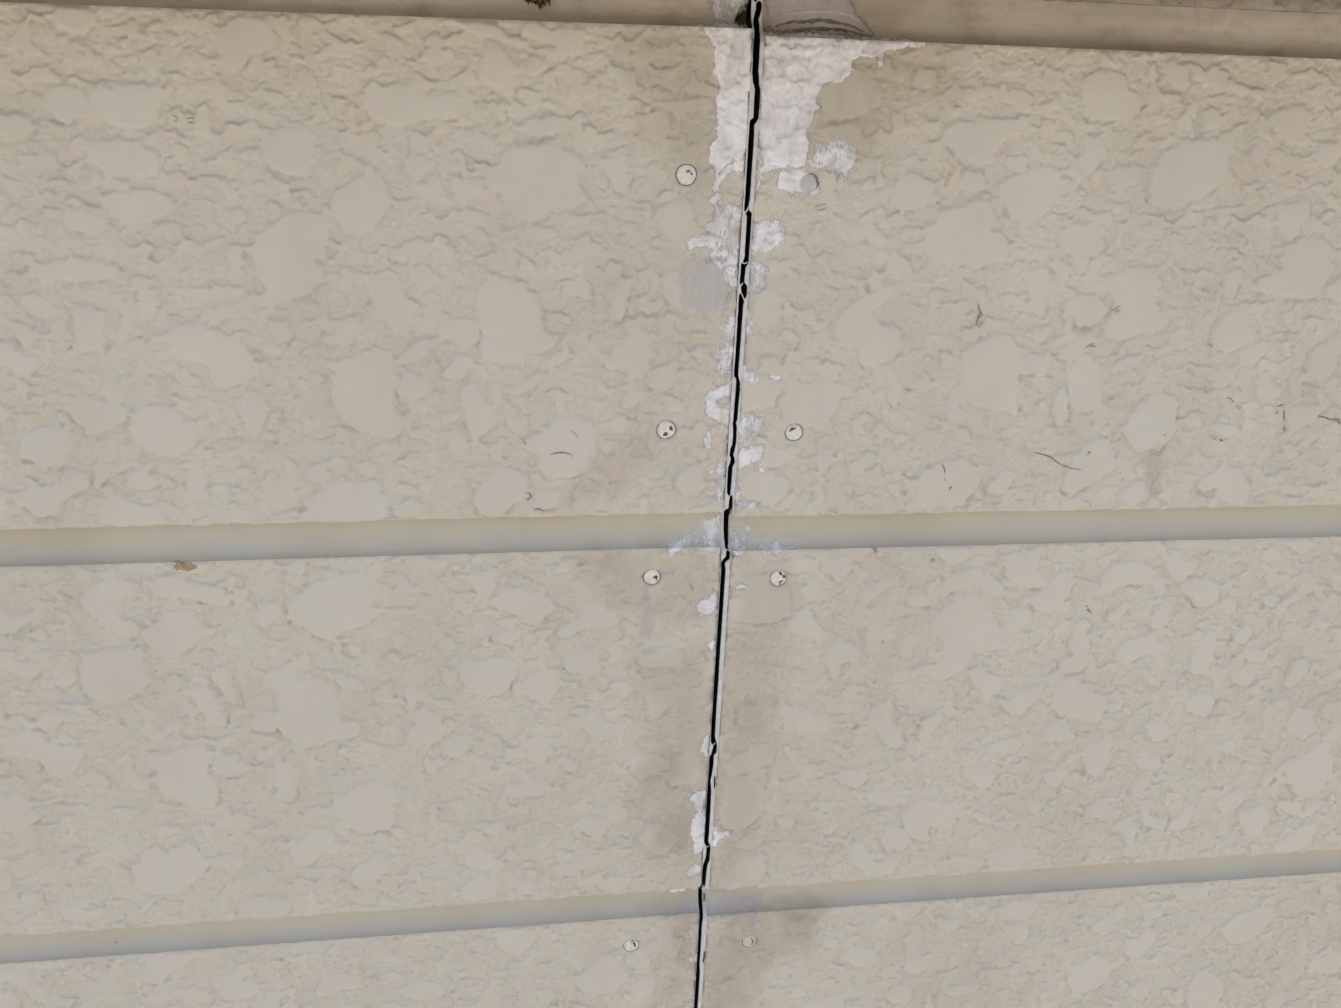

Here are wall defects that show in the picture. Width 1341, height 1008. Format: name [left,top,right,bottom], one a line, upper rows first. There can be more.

crack [693,0,762,1008]